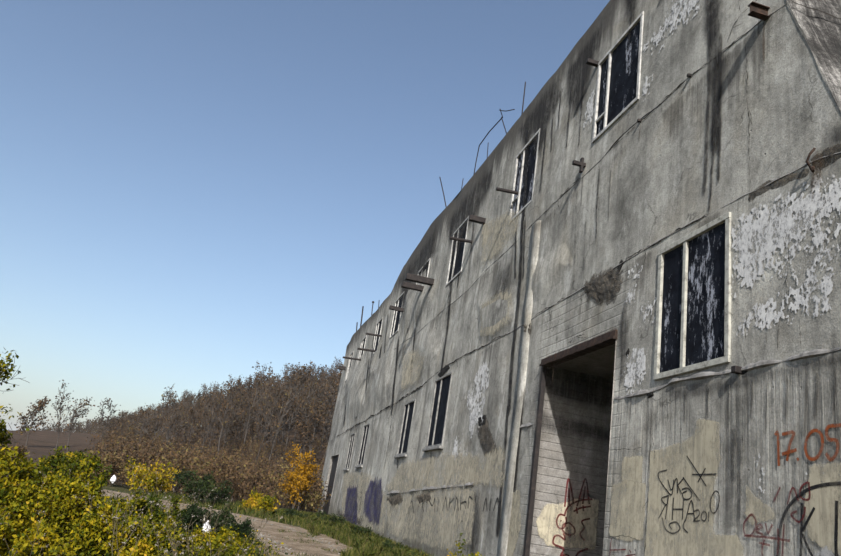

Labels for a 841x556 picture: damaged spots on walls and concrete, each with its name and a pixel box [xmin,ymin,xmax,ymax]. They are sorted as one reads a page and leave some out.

peeling [643,0,700,55]
damp [702,0,726,211]
peeling [730,144,841,336]
peeling [452,362,497,461]
peeling [622,348,654,398]